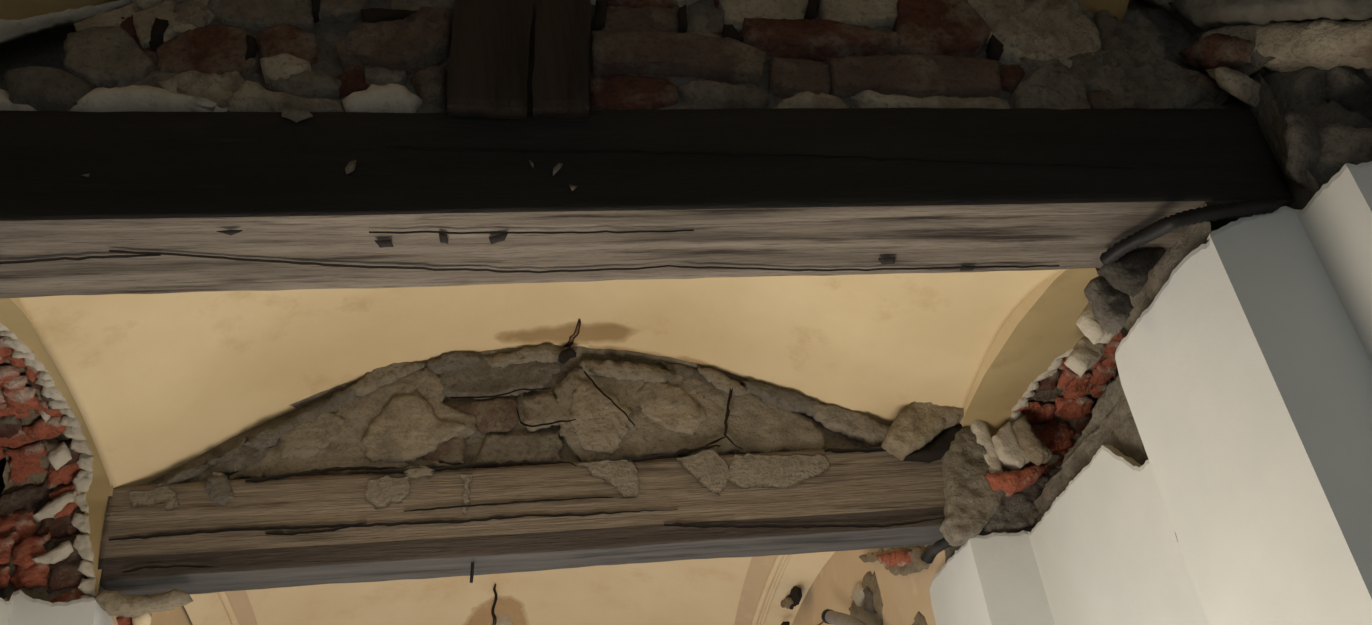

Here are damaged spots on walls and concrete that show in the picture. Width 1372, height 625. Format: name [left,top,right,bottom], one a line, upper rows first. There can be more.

spalling [1145,0,1372,210]
flaking render [0,323,193,625]
flaking render [155,343,564,488]
crack [245,455,577,483]
crack [450,319,743,463]
flaking render [579,360,676,383]
flaking render [696,366,891,448]
crack [824,446,886,454]
flaking render [970,303,1124,497]
crack [490,584,498,625]
spalling [780,586,802,625]
flaking render [849,546,930,625]